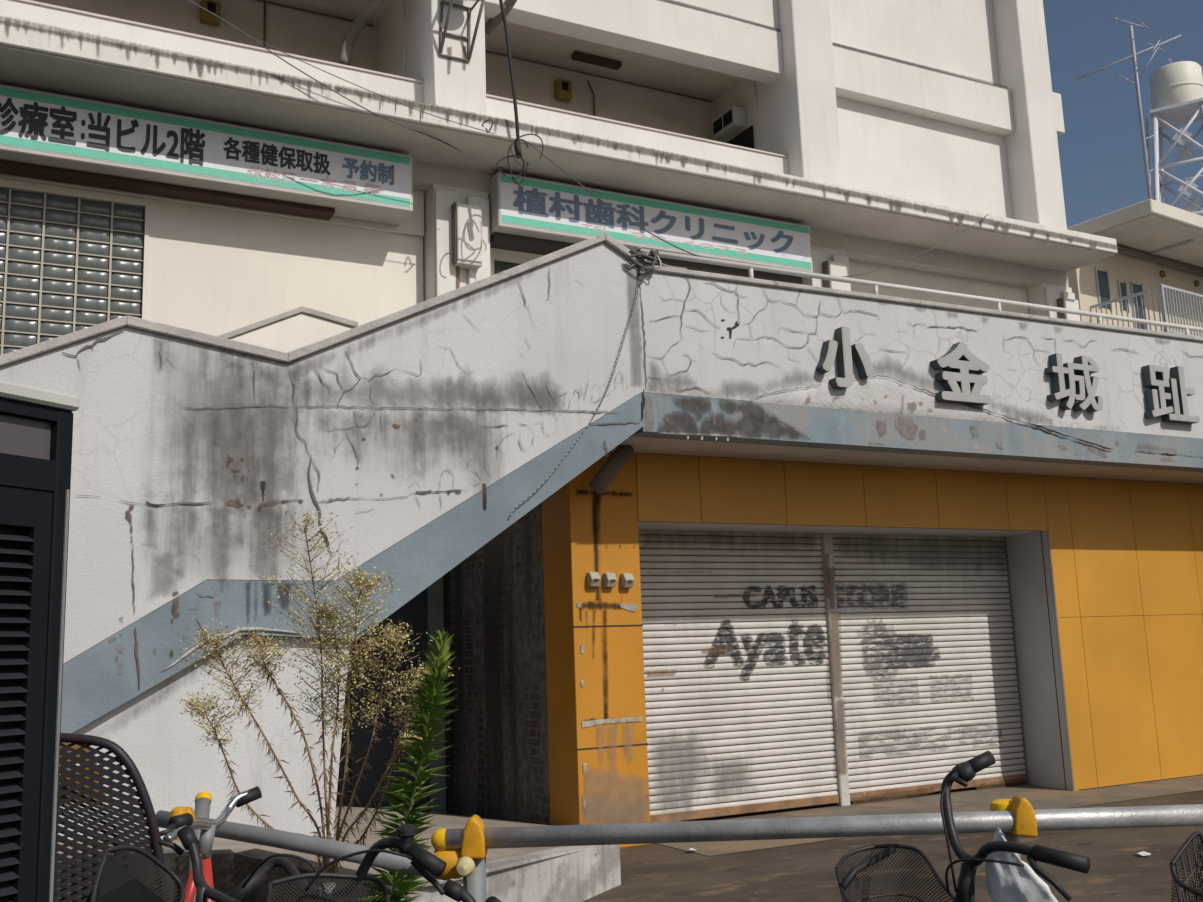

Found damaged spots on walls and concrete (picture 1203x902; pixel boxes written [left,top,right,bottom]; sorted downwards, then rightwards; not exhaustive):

damp [0,17,1117,255]
crack [79,495,212,506]
crack [183,265,1203,580]
damp [658,386,801,441]
peeling [870,416,926,444]
crack [132,540,140,689]